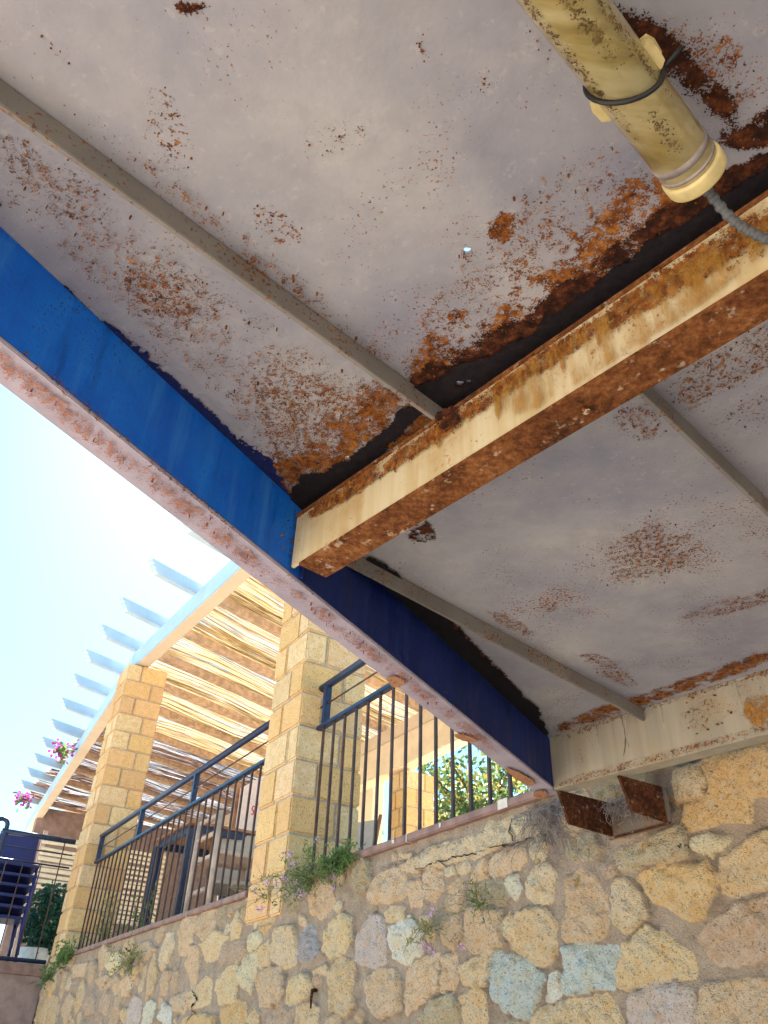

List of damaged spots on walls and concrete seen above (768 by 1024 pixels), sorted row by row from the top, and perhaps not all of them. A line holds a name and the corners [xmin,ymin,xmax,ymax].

rust [0,0,768,518]
rust [0,351,496,753]
rust [586,510,712,593]
rust [383,585,768,786]
crack [414,818,547,869]